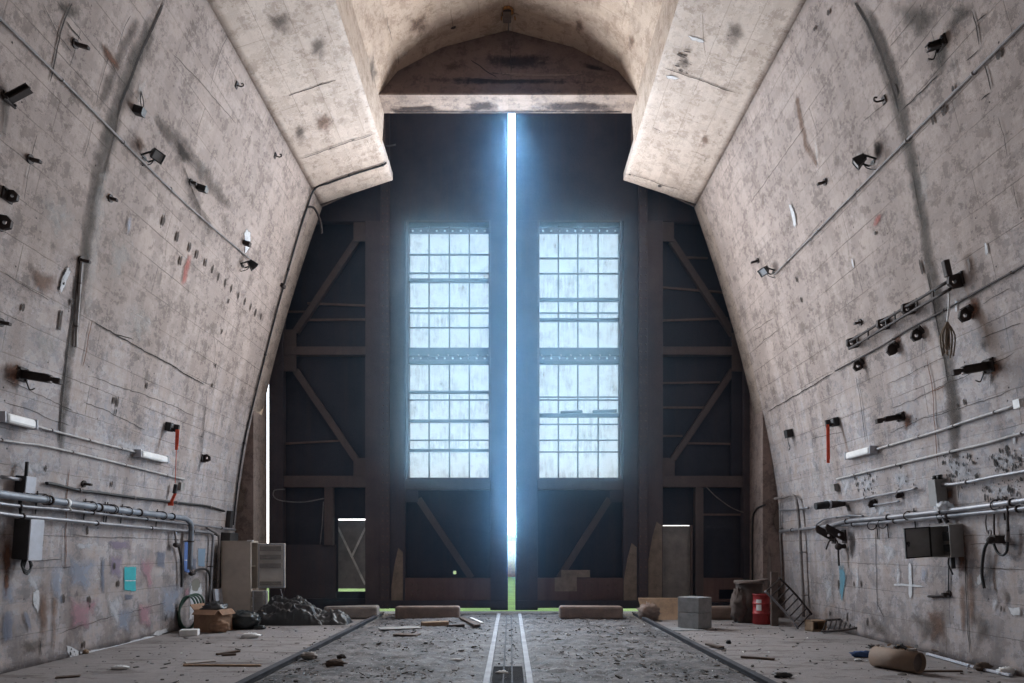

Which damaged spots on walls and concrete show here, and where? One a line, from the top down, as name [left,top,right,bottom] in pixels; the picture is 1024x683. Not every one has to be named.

water stain [59,4,164,444]
rust [795,98,817,165]
water stain [855,3,960,460]
peeling [942,432,1023,502]